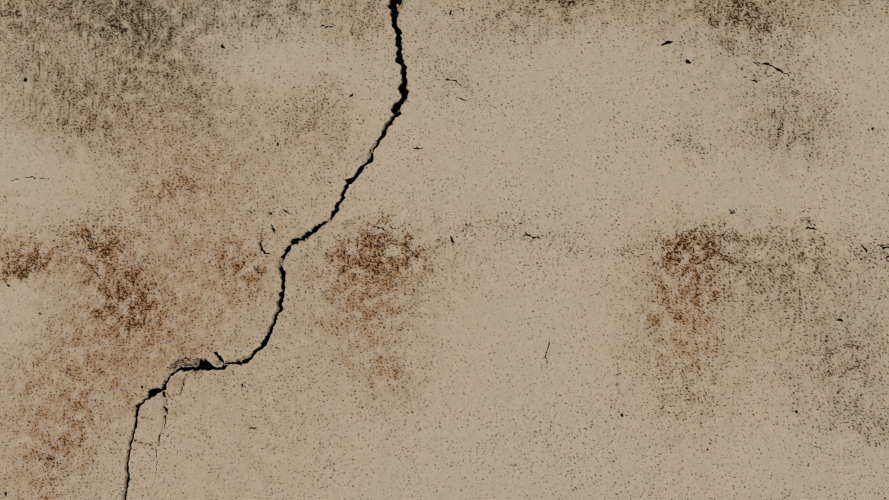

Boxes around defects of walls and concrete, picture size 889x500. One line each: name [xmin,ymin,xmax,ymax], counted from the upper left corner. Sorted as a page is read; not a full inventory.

crack [122,0,411,500]